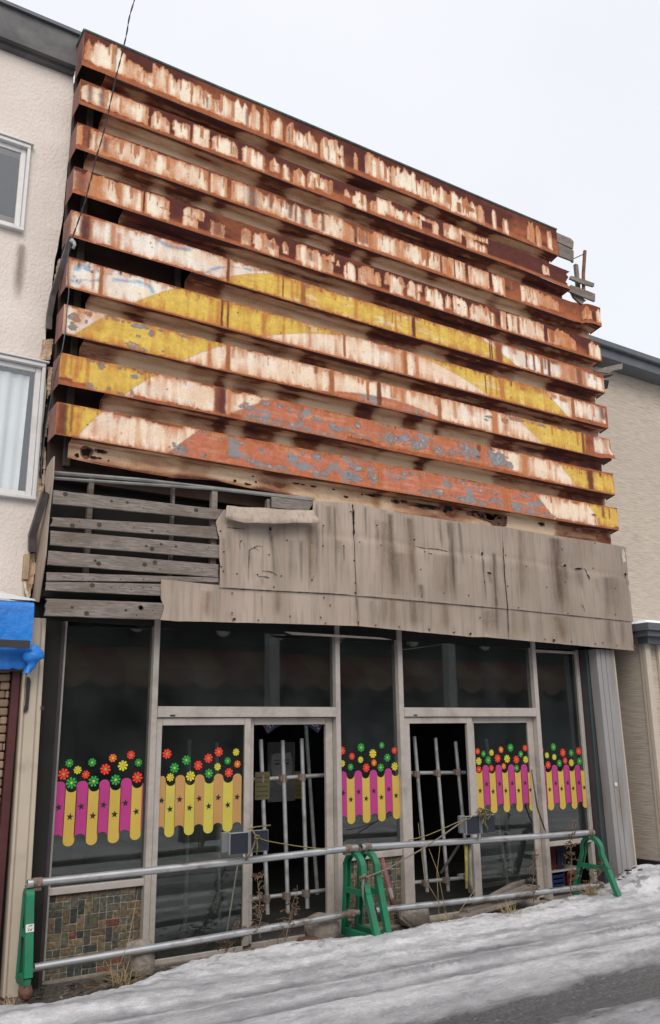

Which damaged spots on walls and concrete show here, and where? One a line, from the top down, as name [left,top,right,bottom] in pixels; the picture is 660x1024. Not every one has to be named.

corrosion [55,31,619,544]
peeling [239,400,372,440]
peeling [301,450,330,478]
peeling [387,433,514,468]
peeling [347,462,555,518]